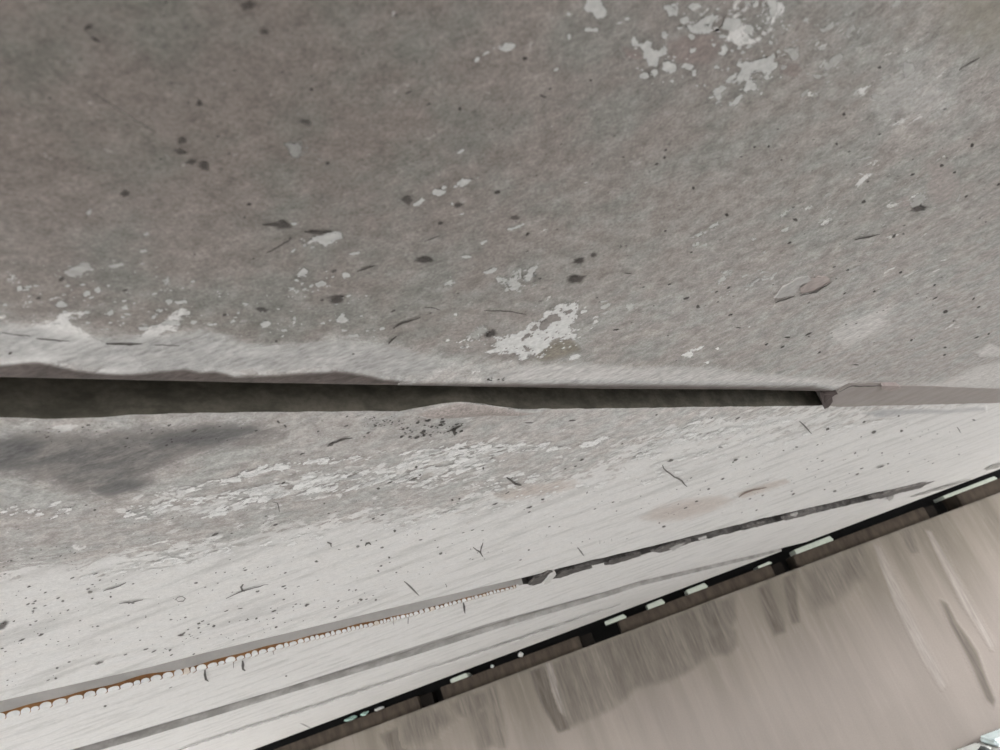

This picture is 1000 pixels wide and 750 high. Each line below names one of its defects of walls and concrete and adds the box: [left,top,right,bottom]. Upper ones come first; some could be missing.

peeling [629,0,871,106]
peeling [52,249,268,334]
peeling [446,300,611,362]
water stain [0,413,294,506]
peeling [123,435,609,520]
corrosion [0,585,516,719]